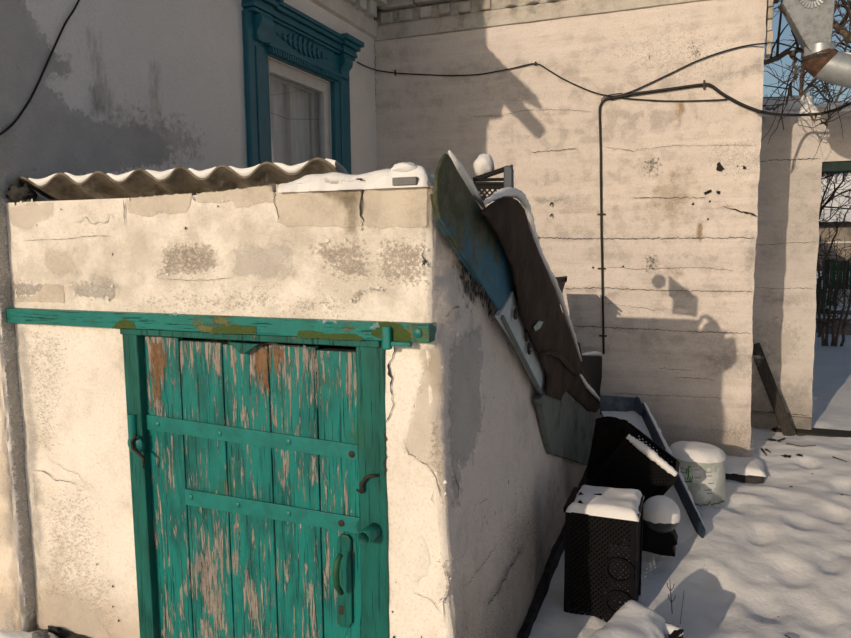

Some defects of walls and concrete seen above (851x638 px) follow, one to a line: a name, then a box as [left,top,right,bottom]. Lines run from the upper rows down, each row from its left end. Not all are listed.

peeling [126,181,435,304]
crack [540,237,810,246]
crack [634,197,756,216]
crack [383,346,395,474]
peeling [428,330,485,508]
crack [406,449,488,522]